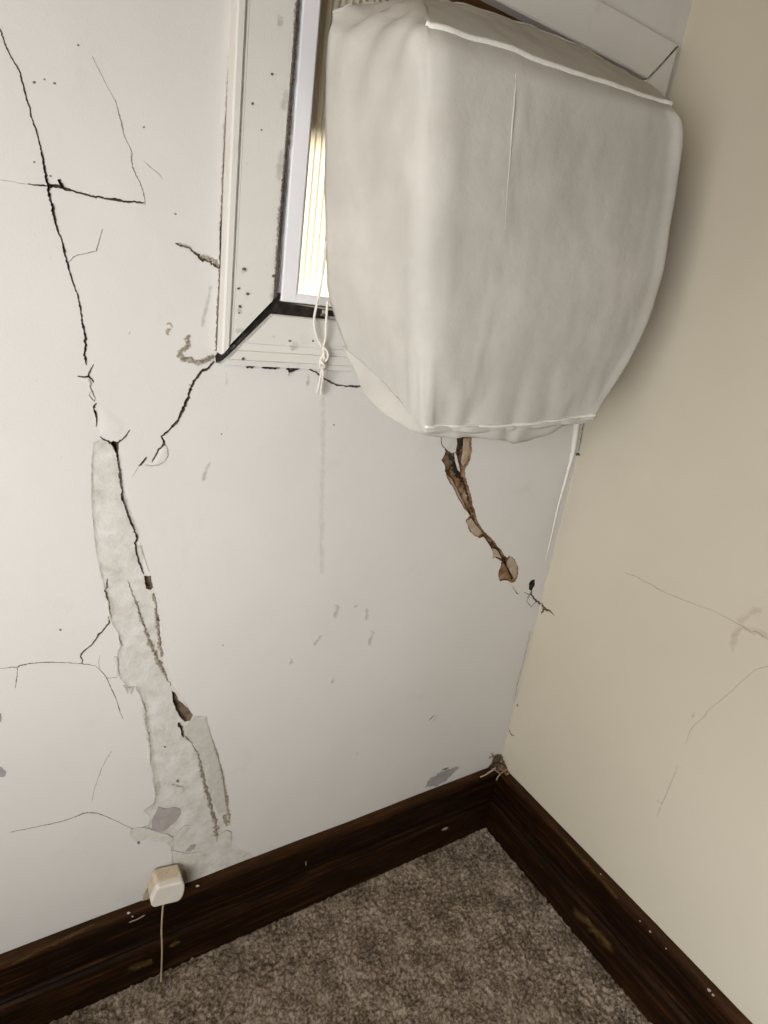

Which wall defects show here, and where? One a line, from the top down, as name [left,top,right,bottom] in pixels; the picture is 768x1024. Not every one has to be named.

crack [0,30,228,574]
crack [0,624,123,718]
peeling [91,440,253,887]
crack [13,751,133,832]
spalling [480,753,509,780]